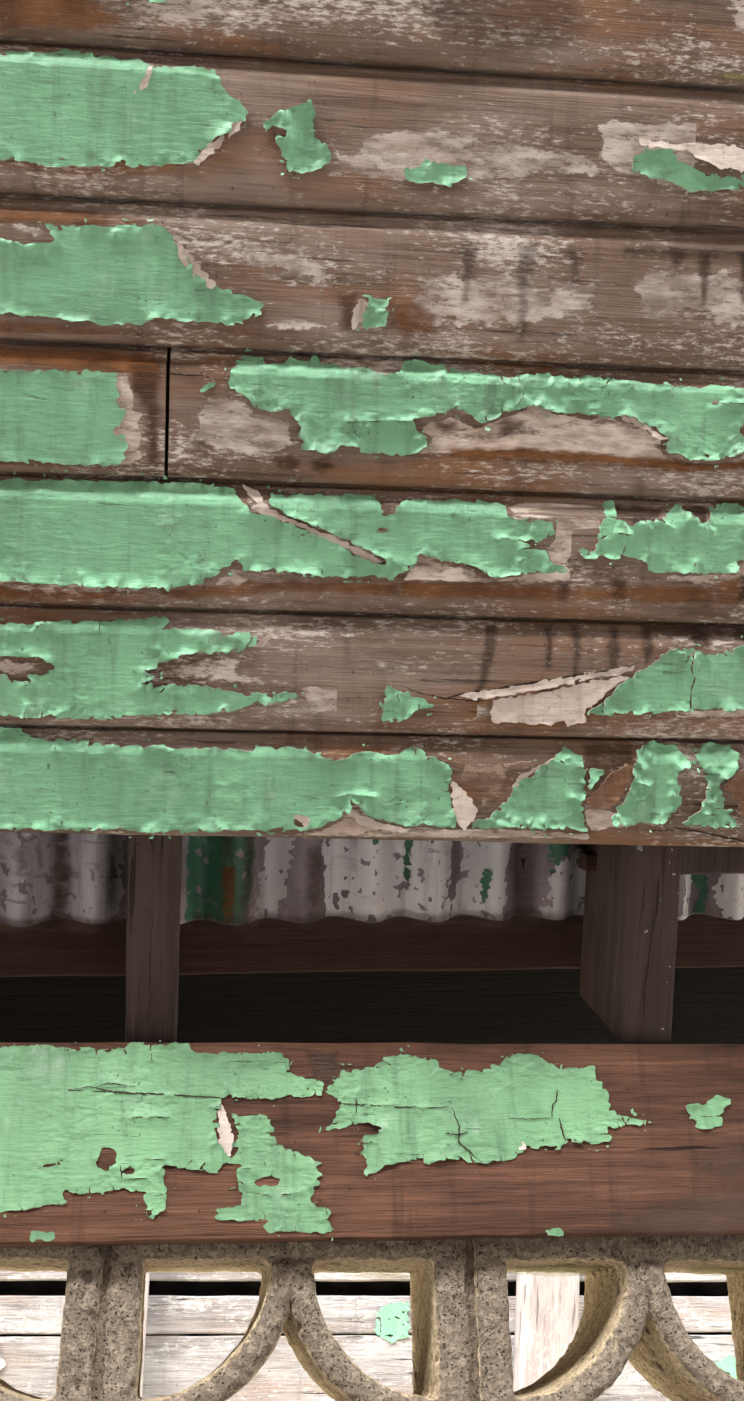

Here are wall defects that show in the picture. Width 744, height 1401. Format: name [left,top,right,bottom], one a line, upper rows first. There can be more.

peeling [726,0,744,33]
peeling [0,46,744,197]
peeling [0,218,394,334]
water stain [626,249,744,302]
peeling [197,347,744,468]
peeling [0,369,744,595]
peeling [0,608,744,926]
peeling [0,1040,651,1241]
peeling [686,1095,731,1129]
peeling [30,1231,55,1243]